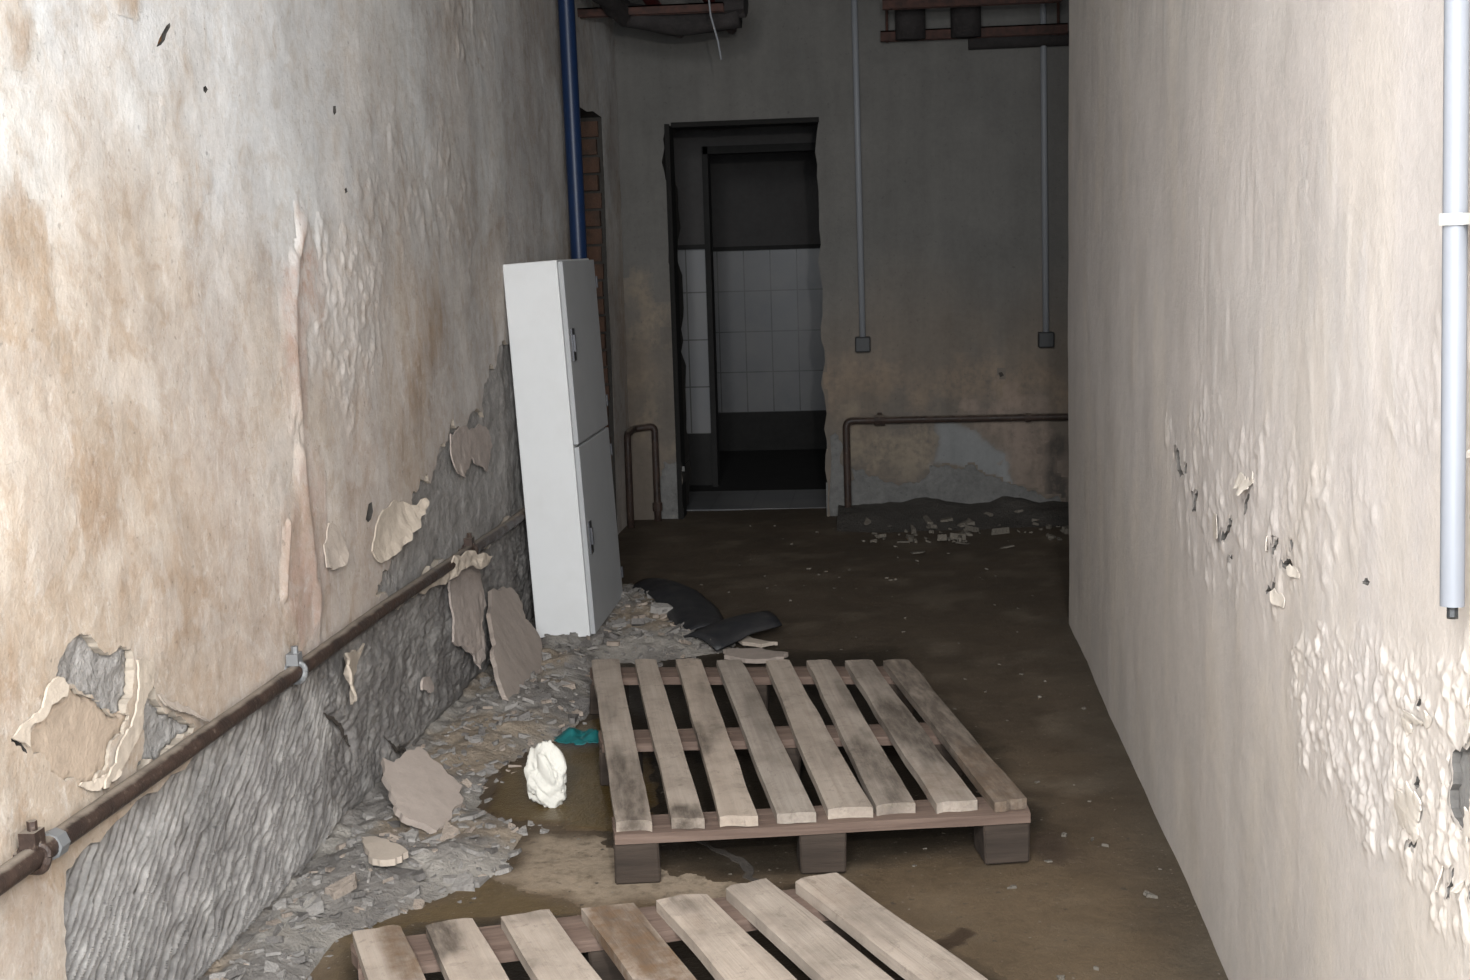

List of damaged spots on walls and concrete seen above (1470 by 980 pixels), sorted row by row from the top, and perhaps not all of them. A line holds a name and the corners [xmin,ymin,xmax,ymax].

water stain [0,0,45,84]
water stain [109,0,144,30]
water stain [154,28,218,256]
water stain [0,164,228,677]
flaking render [826,422,1061,516]
water stain [0,578,45,866]
flaking render [10,635,211,791]
flaking render [63,343,535,980]
peeling [1270,588,1285,608]
peeling [1286,561,1300,578]
peeling [1285,609,1470,975]
water stain [0,837,82,980]